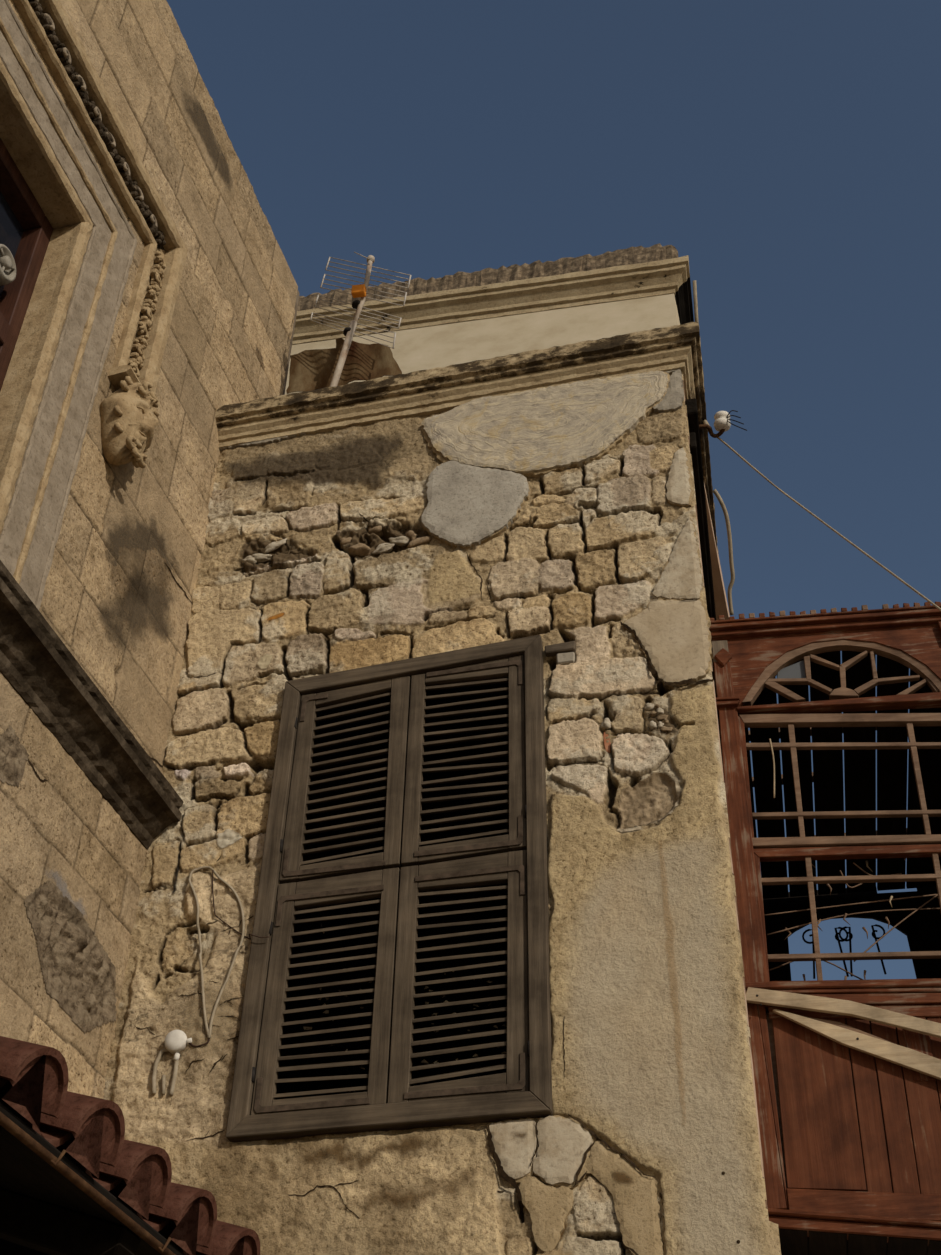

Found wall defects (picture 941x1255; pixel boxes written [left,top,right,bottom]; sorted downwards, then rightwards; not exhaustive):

spalling [240,538,313,574]
spalling [336,522,432,561]
flaking render [621,447,713,690]
crack [620,621,714,696]
spalling [644,703,677,734]
crack [292,1180,360,1219]
flaking render [487,1115,664,1255]